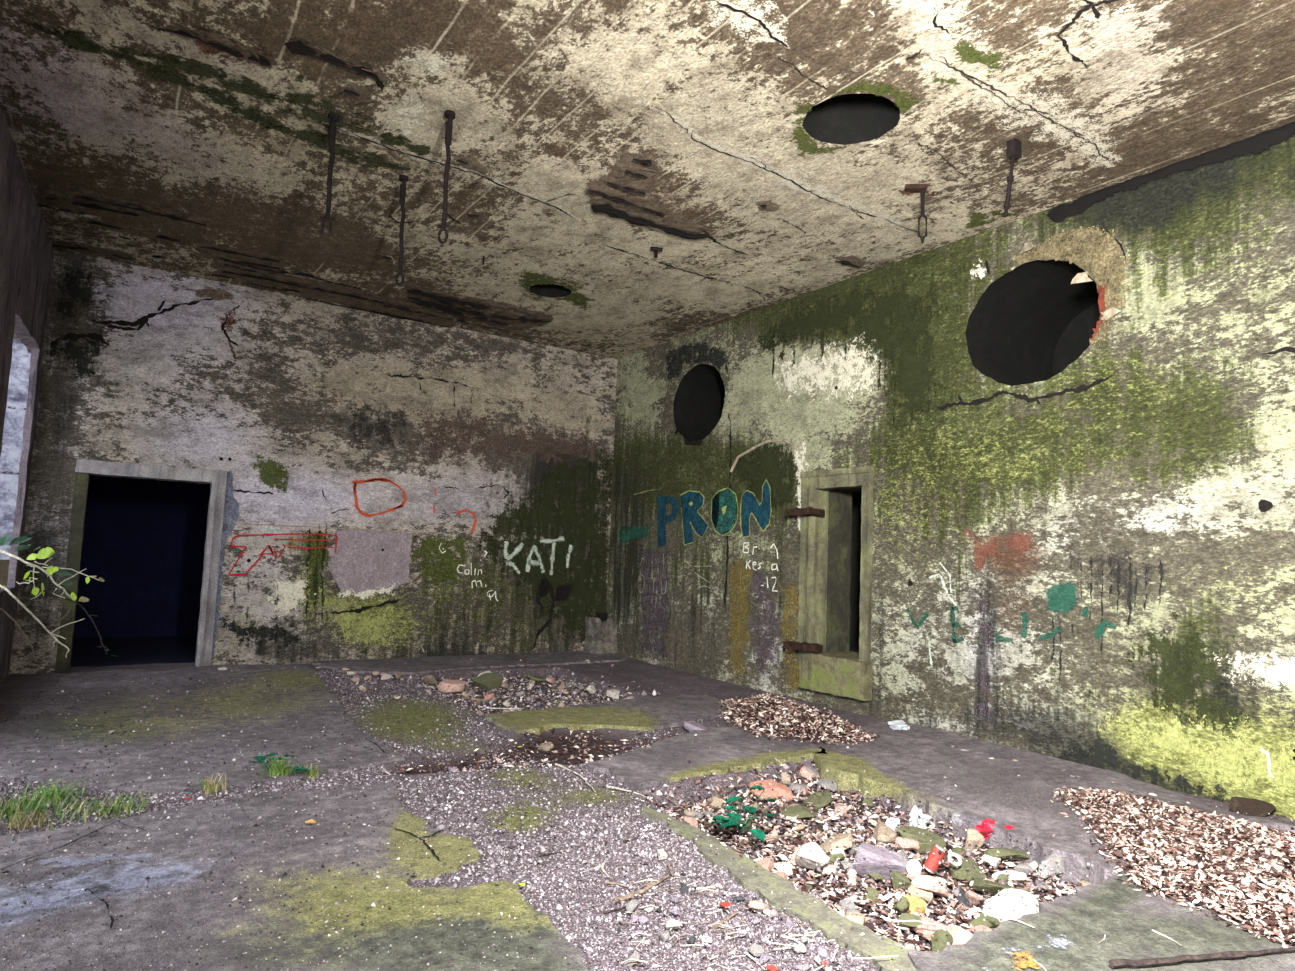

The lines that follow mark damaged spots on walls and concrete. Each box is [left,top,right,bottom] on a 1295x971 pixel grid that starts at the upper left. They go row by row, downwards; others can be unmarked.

spalling [153,22,444,137]
peeling [398,42,454,81]
crack [705,0,828,90]
spalling [584,151,712,240]
spalling [31,187,554,332]
crack [50,298,240,357]
damp [755,273,948,429]
crack [932,375,1112,410]
crack [1264,346,1295,354]
damp [751,563,780,674]
damp [1051,545,1267,742]
damp [1058,723,1227,801]